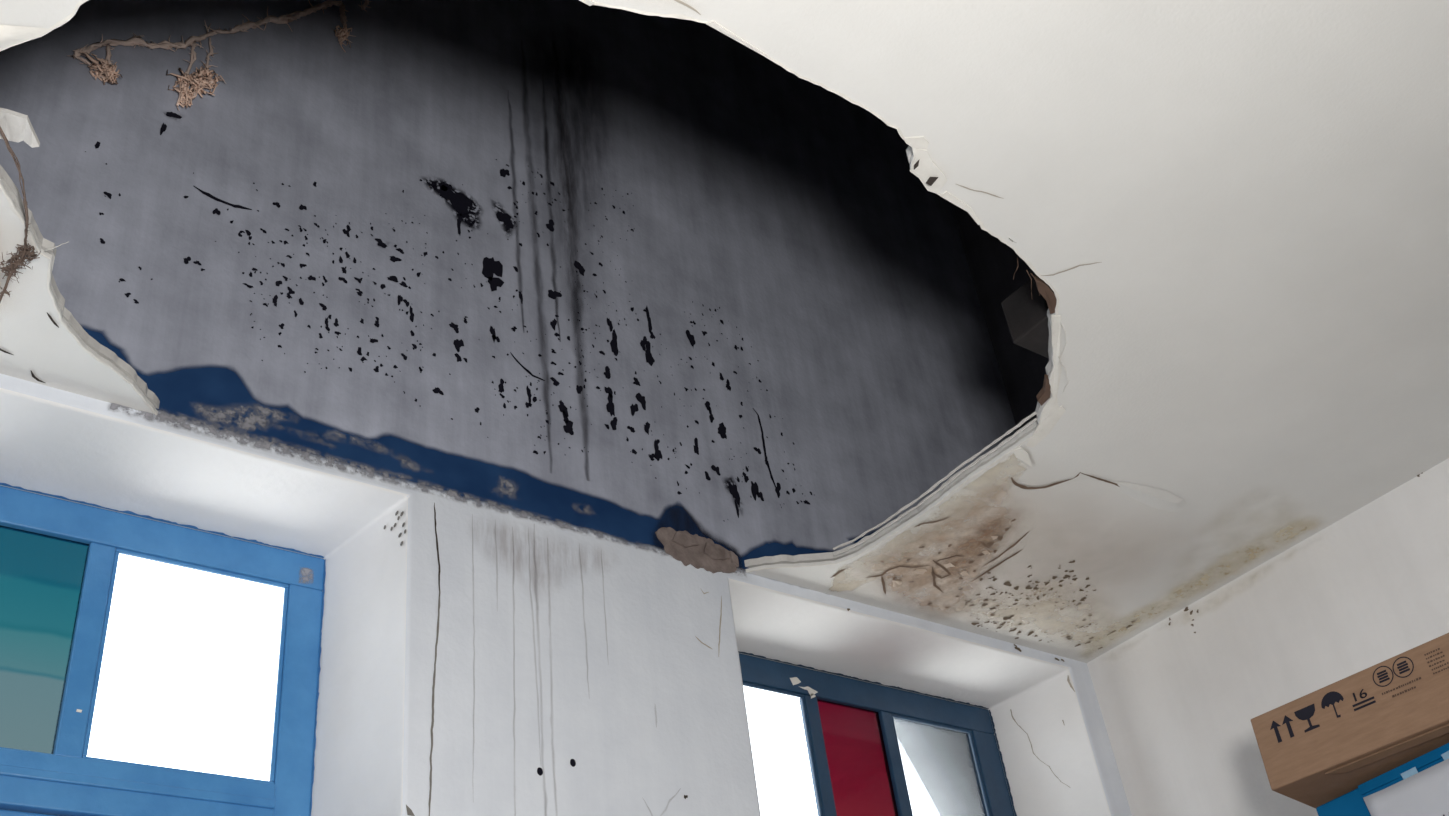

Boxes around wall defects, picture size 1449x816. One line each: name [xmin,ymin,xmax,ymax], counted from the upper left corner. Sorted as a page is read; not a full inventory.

spalling [1,0,88,51]
spalling [0,108,40,148]
crack [0,348,45,383]
spalling [0,184,157,416]
spalling [579,0,1069,573]
crack [429,503,441,816]
water stain [830,466,1135,662]